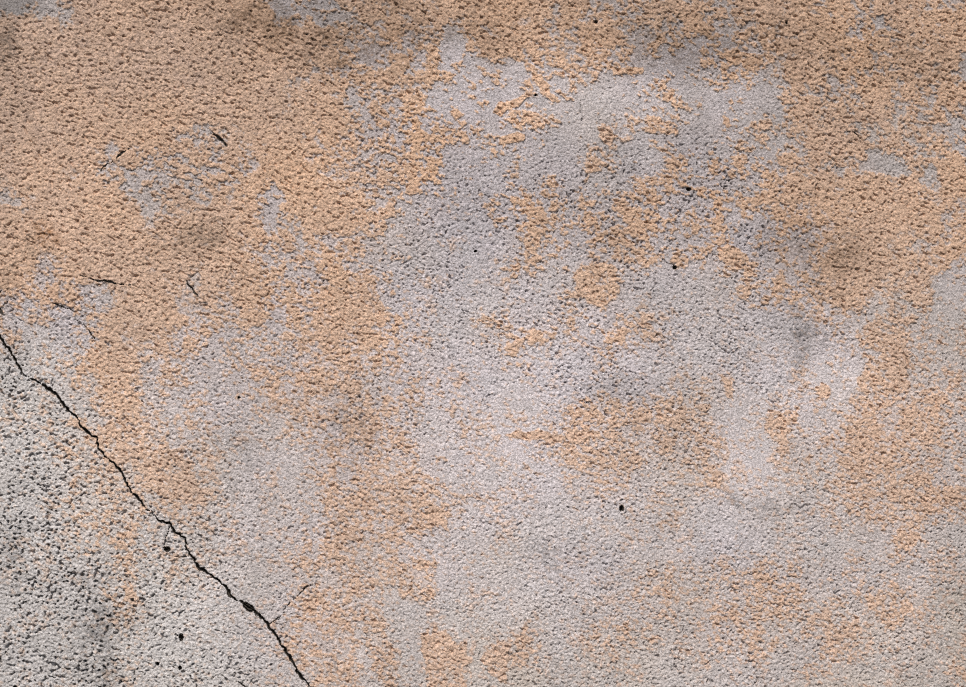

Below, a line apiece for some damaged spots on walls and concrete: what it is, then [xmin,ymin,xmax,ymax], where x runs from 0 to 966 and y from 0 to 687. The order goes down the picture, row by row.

peeling [90,131,246,212]
peeling [262,173,282,259]
peeling [11,299,93,380]
peeling [78,285,115,309]
crack [80,275,131,286]
peeling [363,32,966,631]
spalling [0,357,286,687]
crack [0,291,313,687]
peeling [363,620,398,687]
peeling [420,627,512,687]